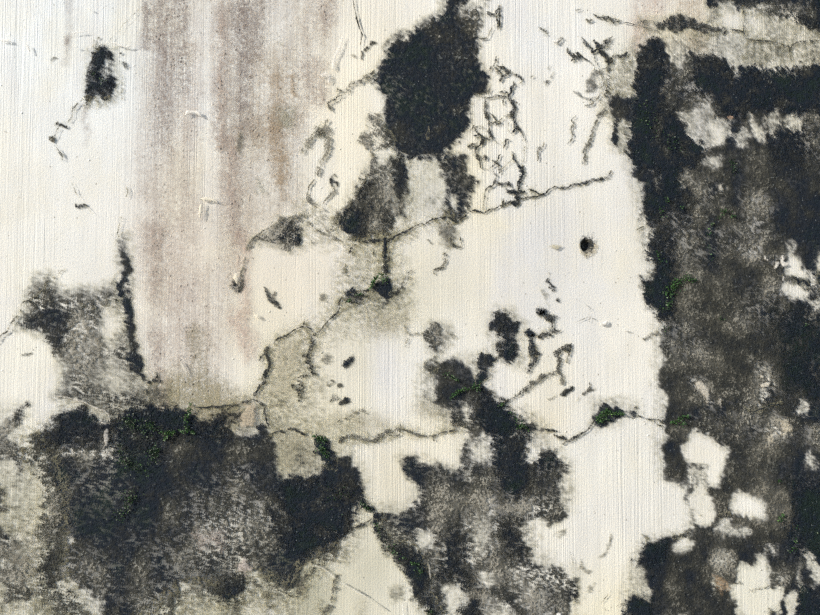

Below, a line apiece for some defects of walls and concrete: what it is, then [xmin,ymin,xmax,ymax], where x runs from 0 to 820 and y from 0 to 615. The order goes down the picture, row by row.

water stain [214,53,289,237]
water stain [258,0,490,313]
crack [240,5,659,276]
crack [196,296,342,435]
water stain [0,237,579,615]
crack [338,412,465,443]
crack [514,308,572,397]
crack [545,421,594,445]
water stain [552,382,594,399]
water stain [578,0,820,615]